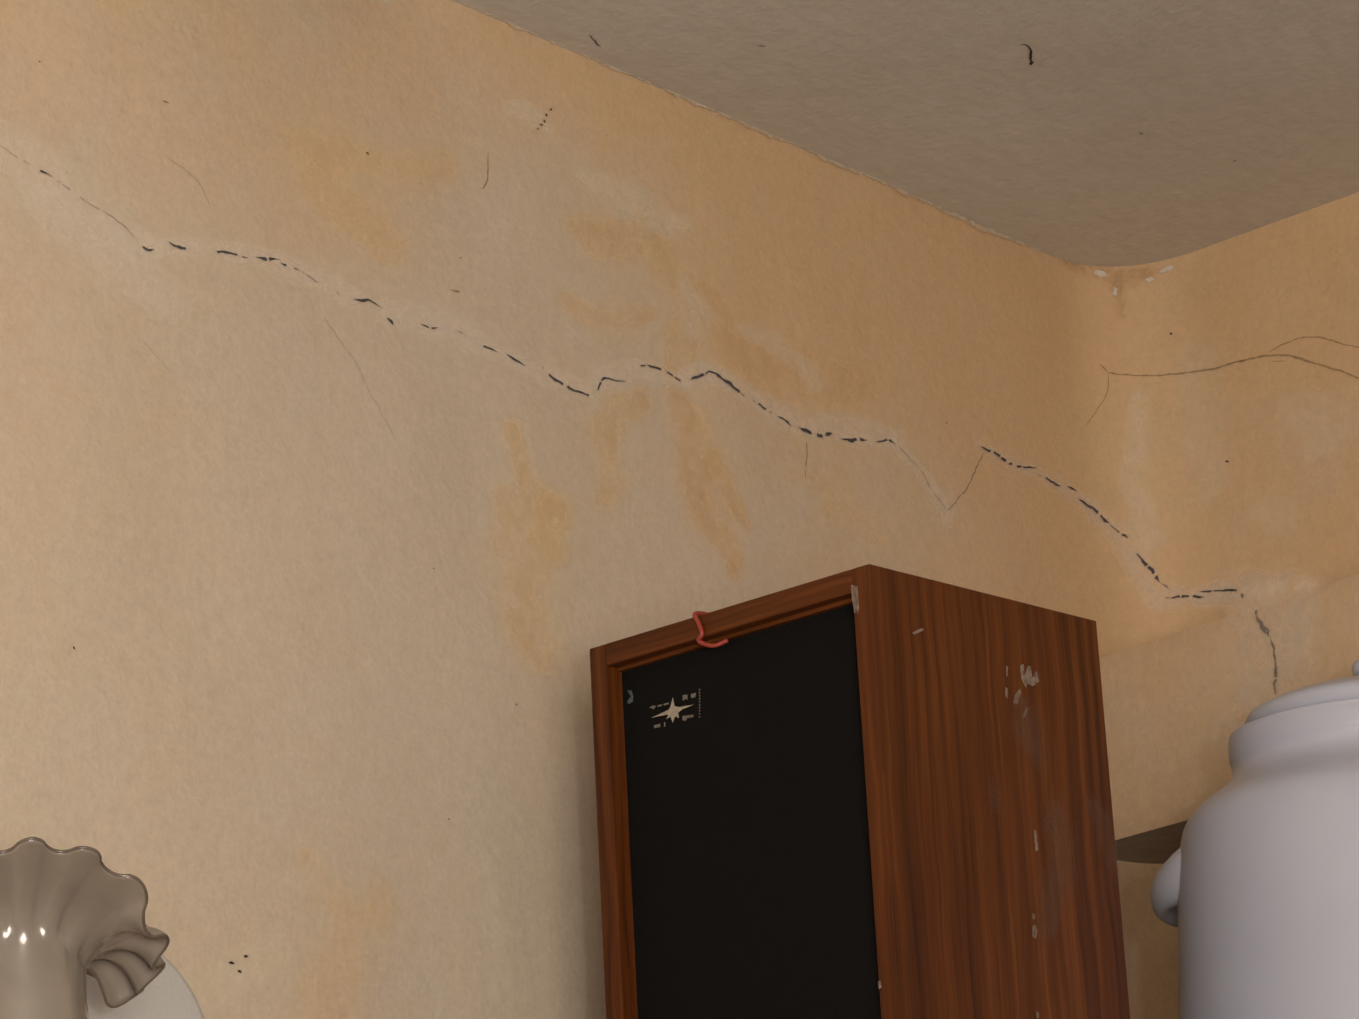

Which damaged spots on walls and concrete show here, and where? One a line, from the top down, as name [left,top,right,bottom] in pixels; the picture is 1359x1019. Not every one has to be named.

crack [3,147,1277,695]
crack [1086,336,1359,425]